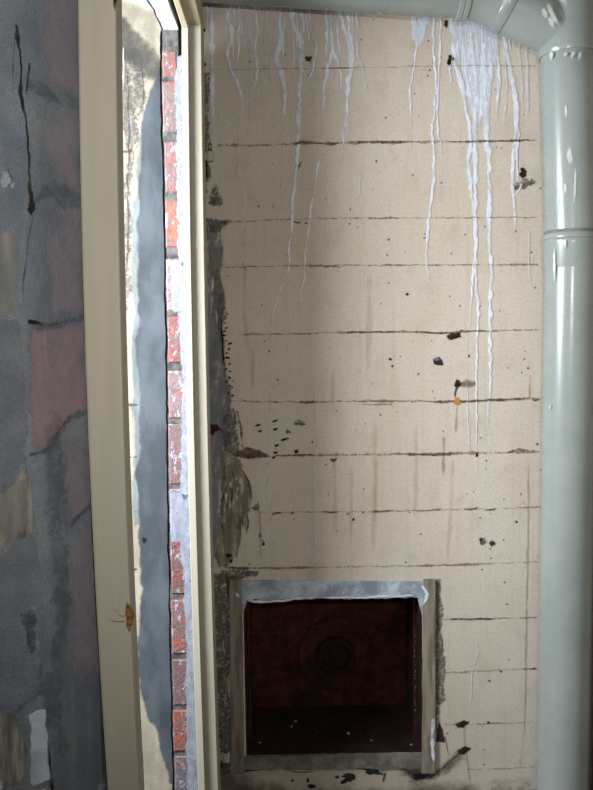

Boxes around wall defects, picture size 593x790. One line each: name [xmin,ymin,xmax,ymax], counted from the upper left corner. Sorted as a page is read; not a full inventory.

crack [7,24,36,282]
efflorescence [206,4,367,333]
efflorescence [409,16,529,447]
spalling [206,218,306,775]
peeling [28,709,51,790]